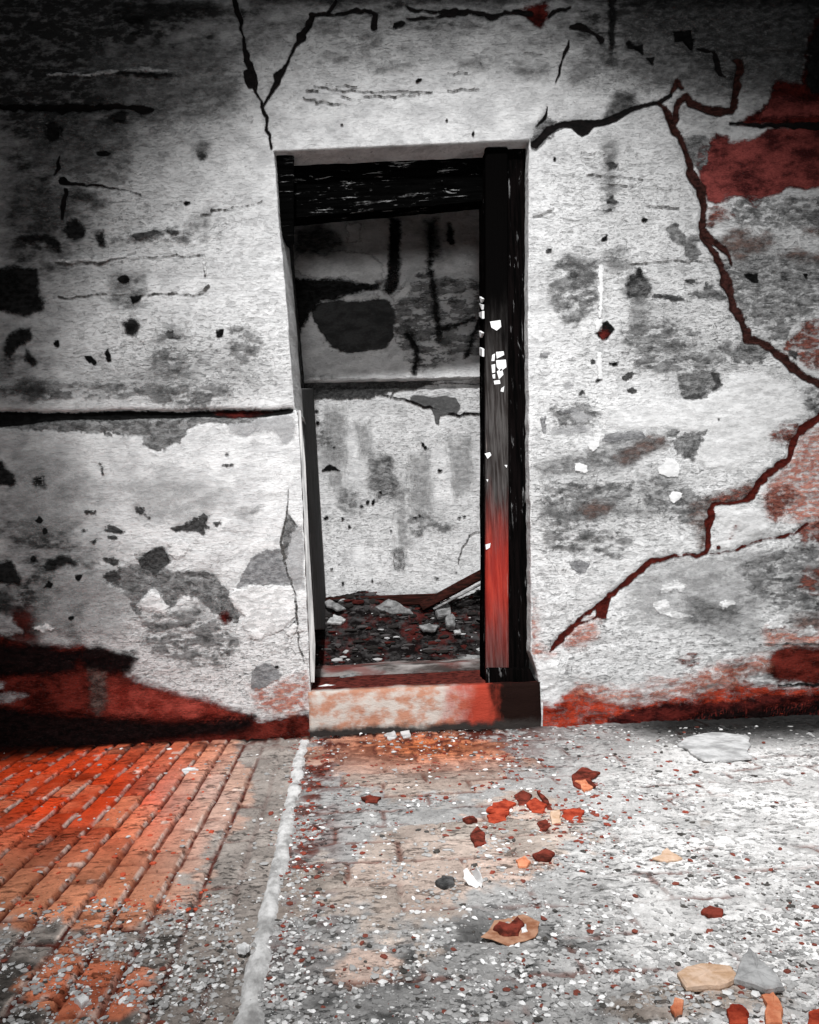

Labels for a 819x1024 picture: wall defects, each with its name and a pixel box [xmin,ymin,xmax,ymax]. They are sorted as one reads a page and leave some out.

crack [232,0,378,149]
crack [303,71,477,105]
flaking render [684,18,819,228]
spalling [594,319,615,339]
crack [406,5,819,652]
flaking render [624,255,819,368]
crack [0,408,293,427]
flaking render [80,513,304,624]
crack [778,681,819,689]